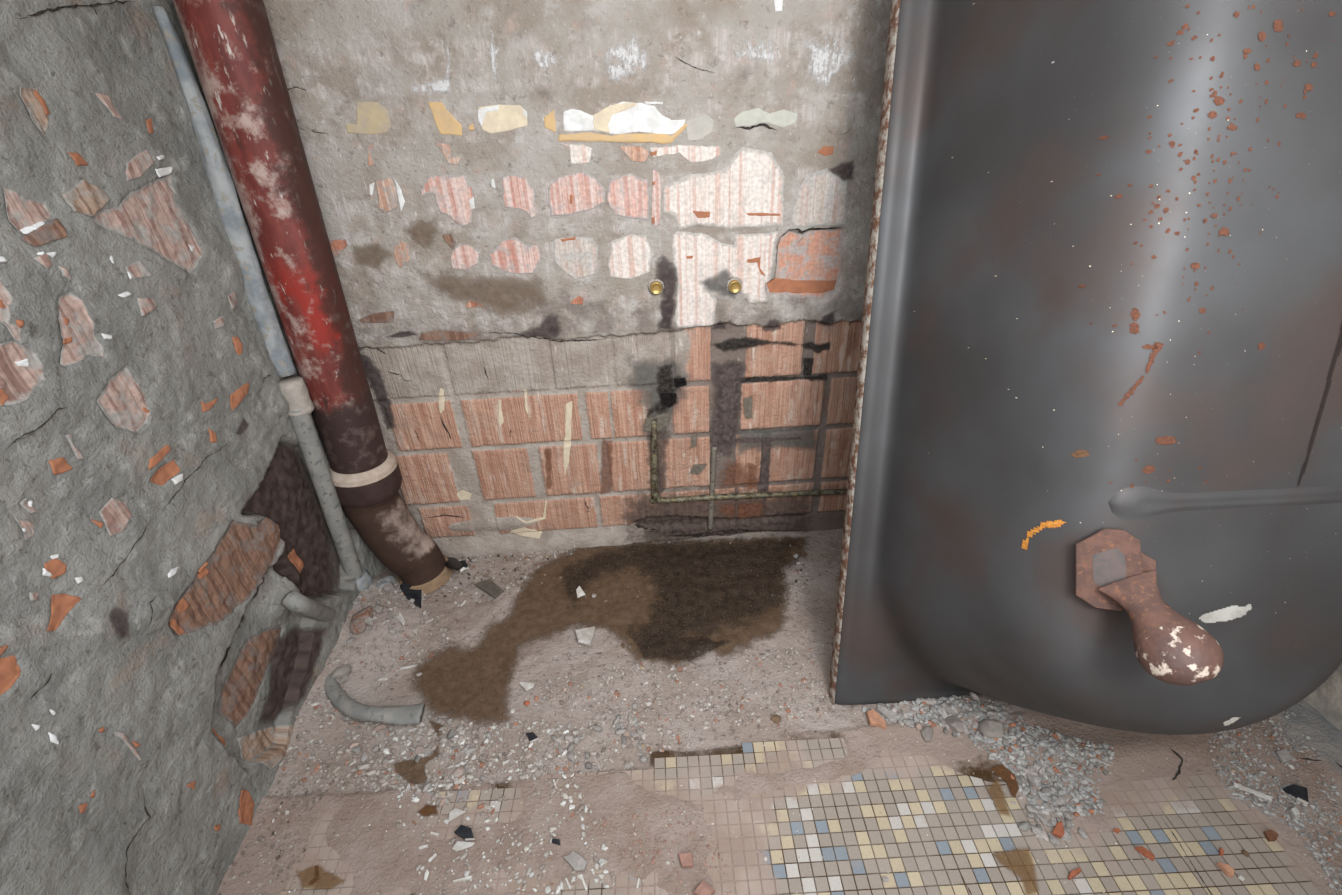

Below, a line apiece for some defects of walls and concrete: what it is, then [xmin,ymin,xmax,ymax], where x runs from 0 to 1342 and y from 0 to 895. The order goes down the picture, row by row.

flaking render [366,144,405,213]
flaking render [420,101,848,328]
flaking render [359,311,395,323]
leakage [657,257,677,329]
leakage [706,271,735,296]
leakage [818,313,835,325]
leakage [361,354,395,429]
flaking render [148,445,183,486]
flaking render [169,516,283,635]
leakage [394,320,830,784]
flaking render [212,627,294,770]
flaking render [238,790,255,826]